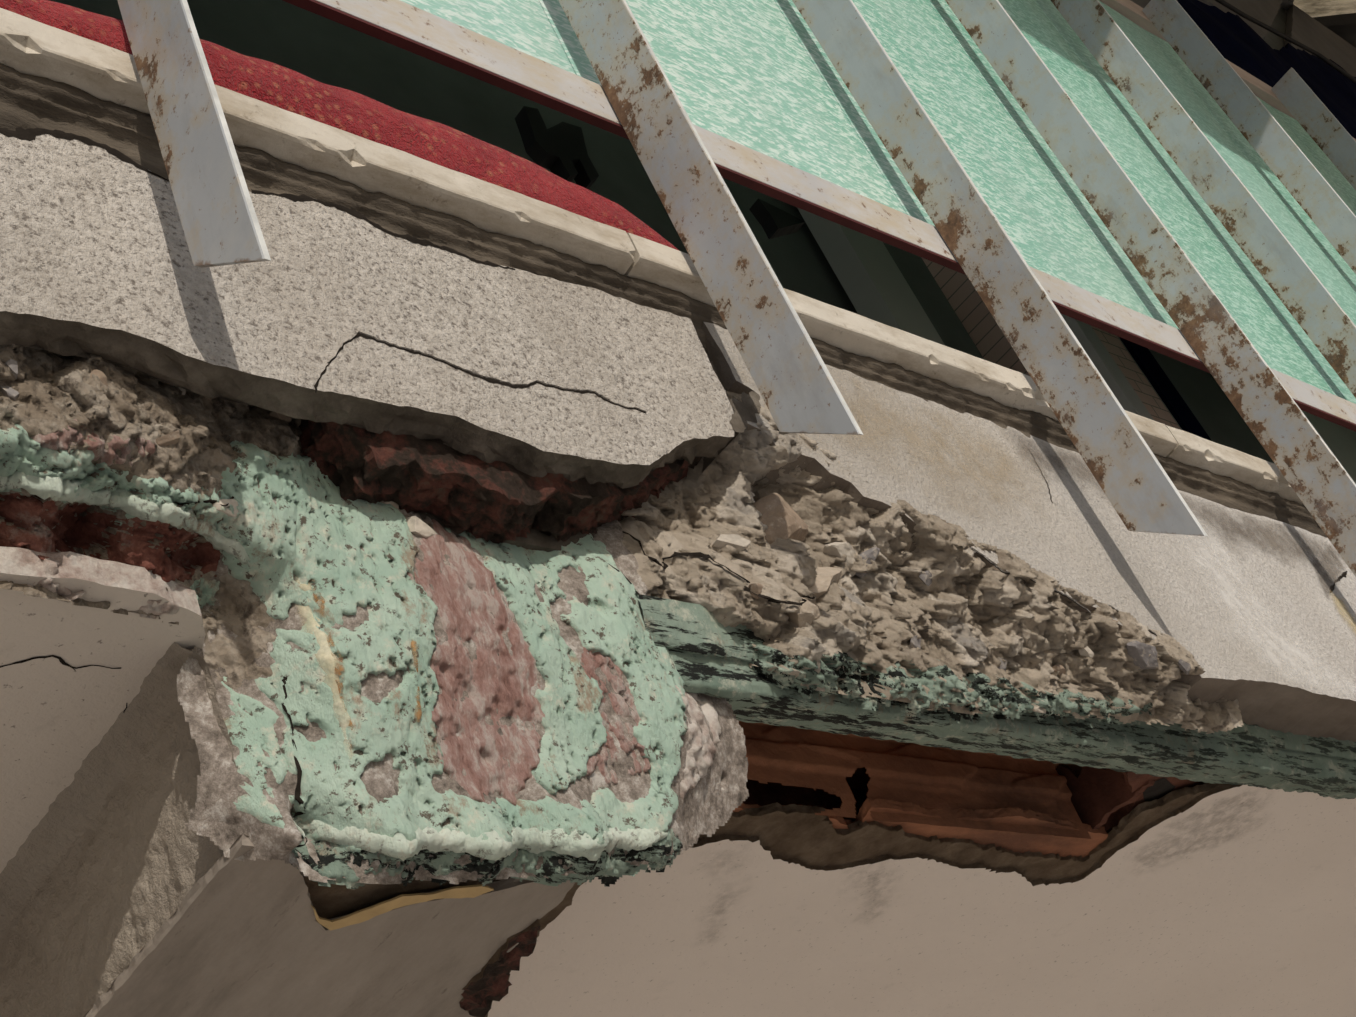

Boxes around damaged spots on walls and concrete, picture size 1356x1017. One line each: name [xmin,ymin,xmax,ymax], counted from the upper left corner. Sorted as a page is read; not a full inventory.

crack [314,331,646,413]
crack [0,655,121,671]
peeling [0,344,1244,931]
flaking render [459,919,540,1017]